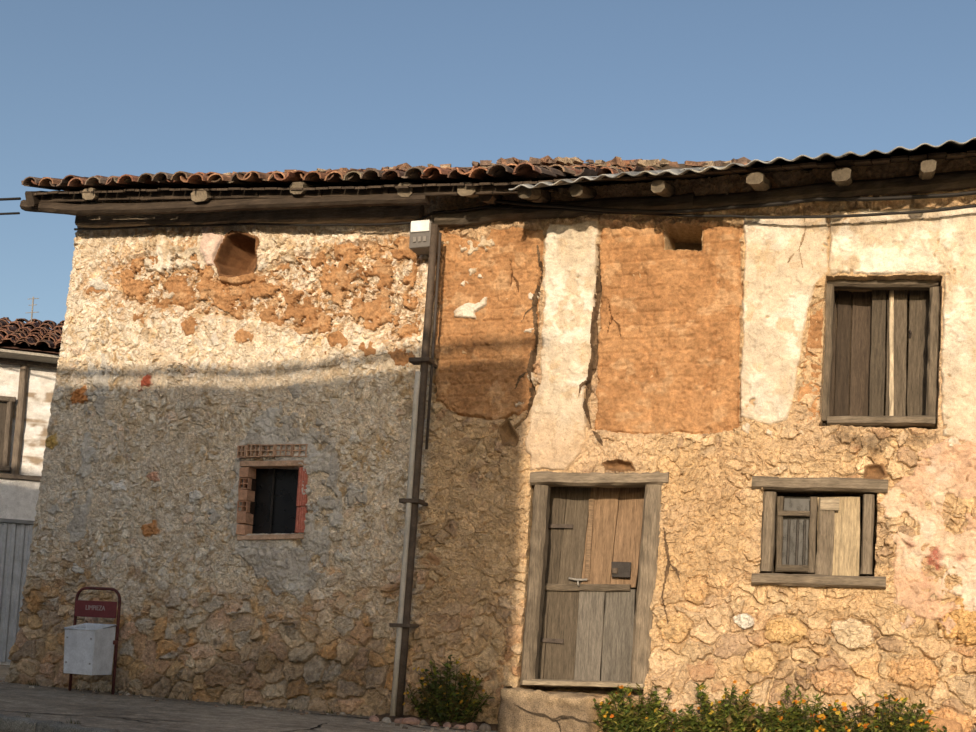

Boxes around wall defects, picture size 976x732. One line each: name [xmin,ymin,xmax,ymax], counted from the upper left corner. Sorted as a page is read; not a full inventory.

flaking render [115,230,420,367]
peeling [207,383,370,603]
flaking render [433,206,976,634]